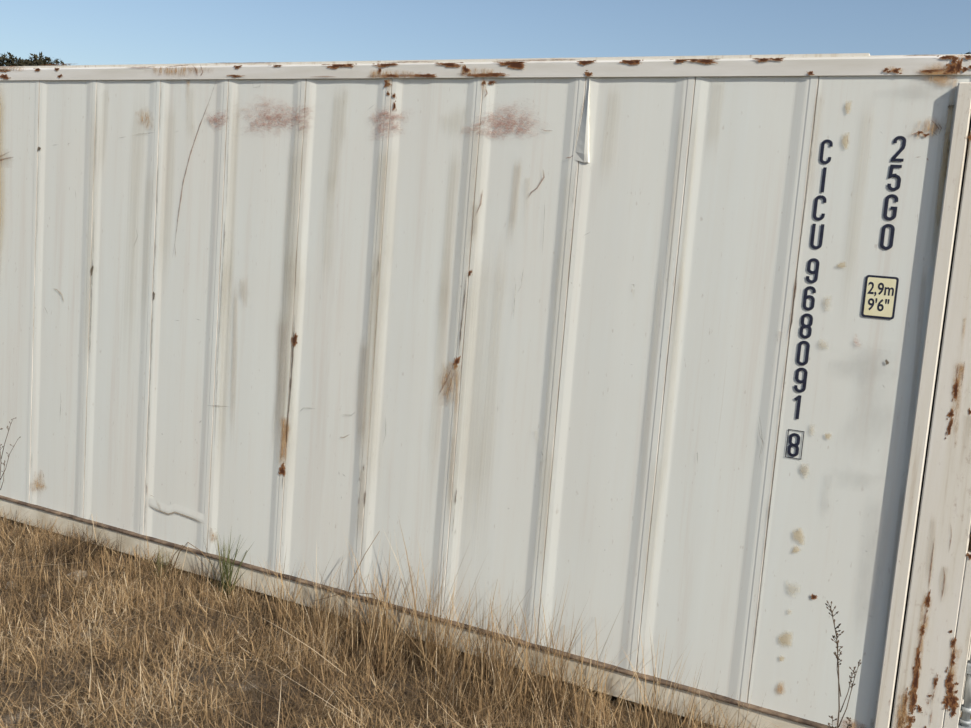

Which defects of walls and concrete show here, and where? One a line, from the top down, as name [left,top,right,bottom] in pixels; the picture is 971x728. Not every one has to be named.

rust [372,59,596,110]
rust [909,55,971,83]
rust [441,270,472,395]
rust [278,333,298,476]
rust [945,367,964,439]
rust [898,545,959,728]